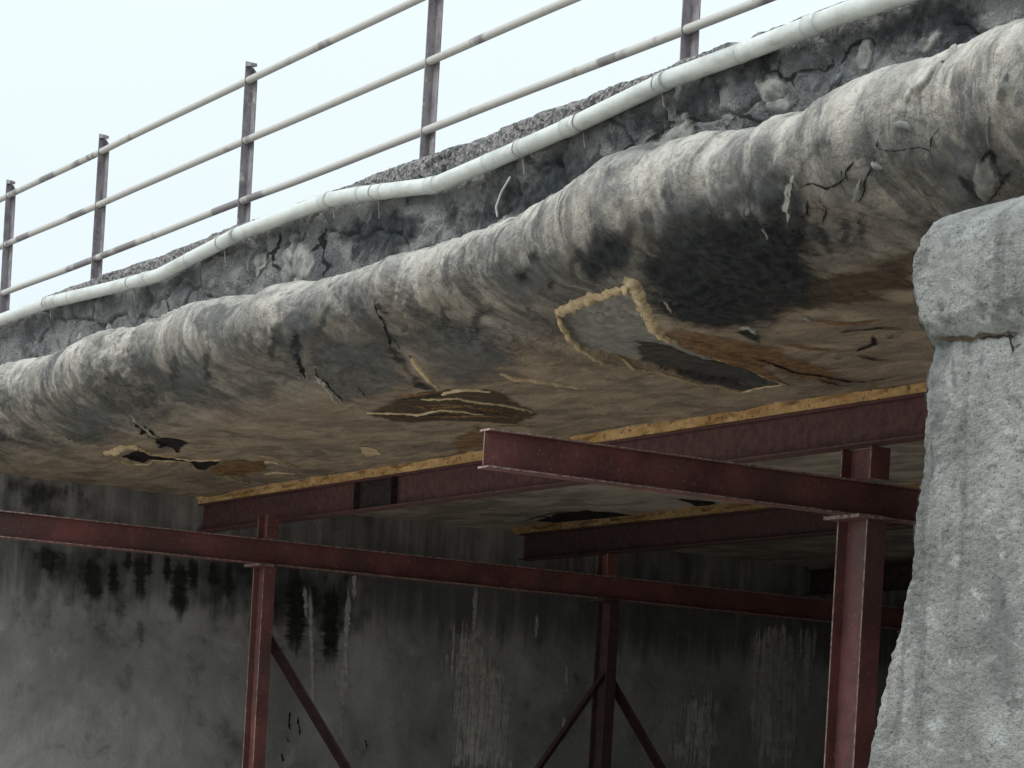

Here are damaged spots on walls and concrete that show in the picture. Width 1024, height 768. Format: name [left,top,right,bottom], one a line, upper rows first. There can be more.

crack [758,37,875,86]
crack [623,109,697,151]
crack [725,114,763,130]
crack [841,127,939,200]
crack [978,150,1020,201]
damp [569,171,947,420]
spalling [555,276,787,394]
crack [938,331,1021,355]
peeling [296,347,535,424]
spalling [103,413,289,477]
damp [34,547,253,615]
damp [274,568,357,739]